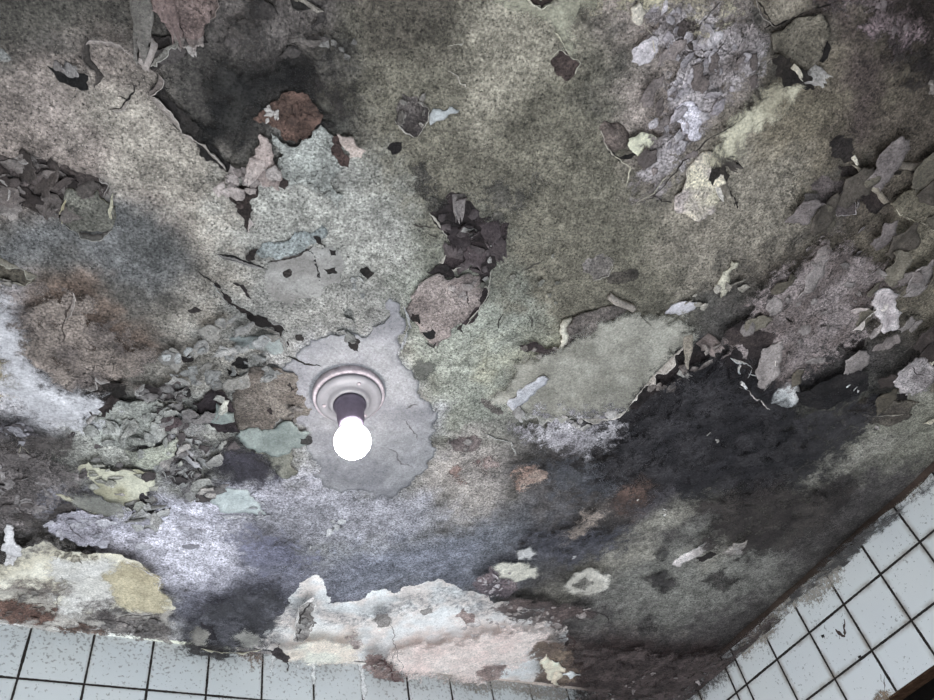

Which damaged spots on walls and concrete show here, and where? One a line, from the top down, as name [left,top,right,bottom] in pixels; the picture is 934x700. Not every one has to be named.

water stain [0,295,106,458]
peeling [0,148,116,242]
peeling [0,192,516,644]
spalling [494,0,602,81]
water stain [508,359,891,593]
peeling [481,135,934,432]
peeling [616,0,833,222]
peeling [253,566,609,689]
water stain [429,475,934,700]